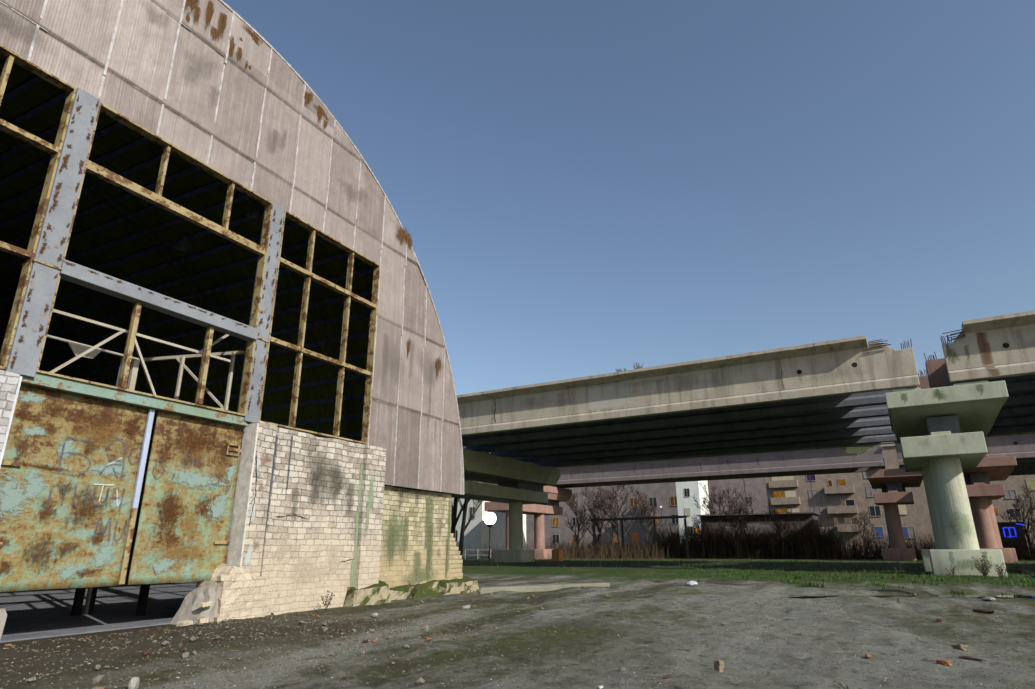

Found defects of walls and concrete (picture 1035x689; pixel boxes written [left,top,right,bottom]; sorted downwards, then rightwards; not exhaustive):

rust [184,0,263,69]
rust [38,95,85,266]
rust [396,224,413,248]
rust [10,271,35,369]
rust [977,333,999,376]
rust [13,400,140,471]
rust [156,427,232,476]
rust [23,537,79,569]
rust [35,483,107,545]
rust [150,491,213,565]
water stain [389,497,432,578]